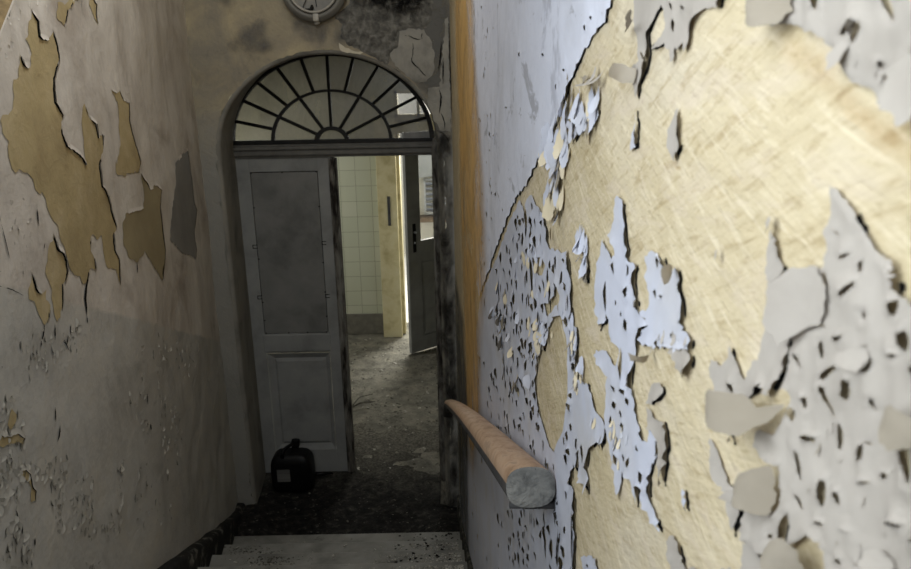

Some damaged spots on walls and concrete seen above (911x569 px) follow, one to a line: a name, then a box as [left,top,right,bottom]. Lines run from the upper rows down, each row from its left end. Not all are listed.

flaking render [334,0,451,132]
leakage [369,0,421,13]
leakage [394,0,448,92]
peeling [745,0,911,127]
peeling [0,0,197,325]
peeling [460,0,724,569]
peeling [705,186,911,569]
peeling [0,394,68,569]